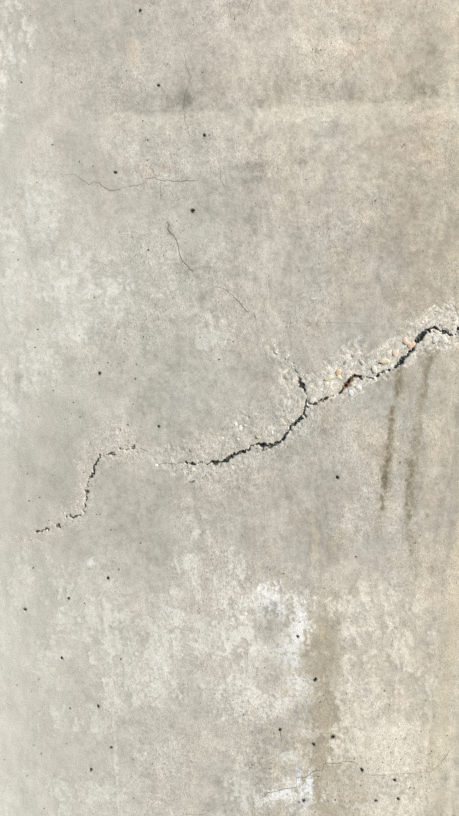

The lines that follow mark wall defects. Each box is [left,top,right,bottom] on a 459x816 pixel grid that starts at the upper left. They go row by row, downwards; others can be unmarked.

crack [350,326,459,379]
crack [85,378,328,495]
damp [0,356,459,816]